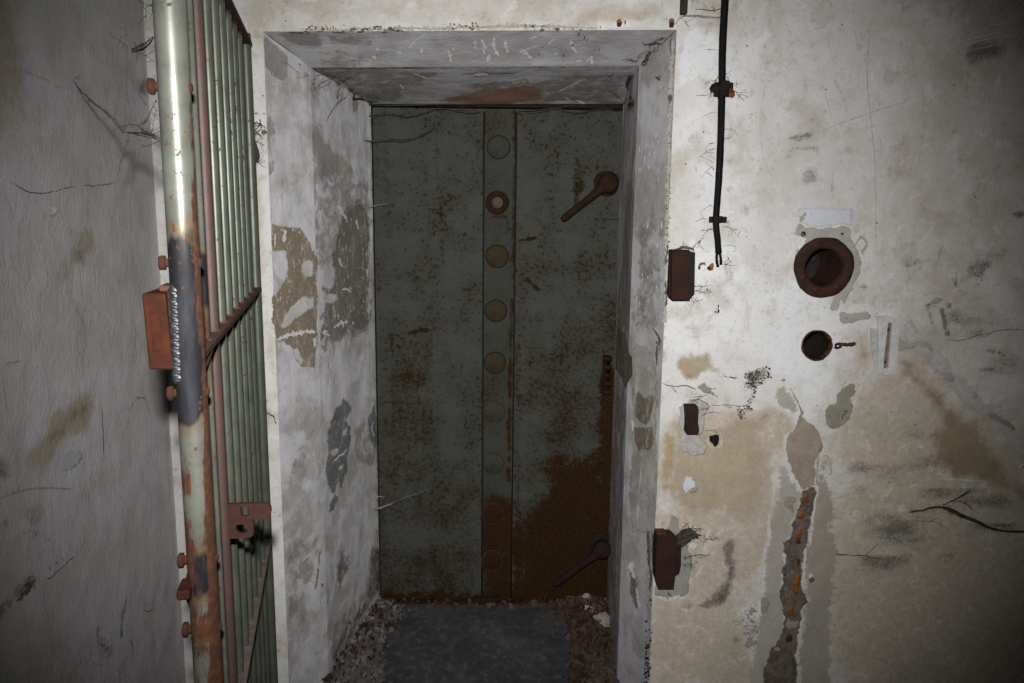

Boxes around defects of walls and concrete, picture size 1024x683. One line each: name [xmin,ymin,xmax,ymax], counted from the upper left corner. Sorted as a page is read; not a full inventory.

corrosion [441,86,540,104]
crack [14,183,114,194]
peeling [271,199,372,367]
peeling [616,34,698,608]
peeling [325,398,351,512]
leakage [665,366,772,512]
corrosion [763,487,816,683]
flaking render [732,379,855,683]